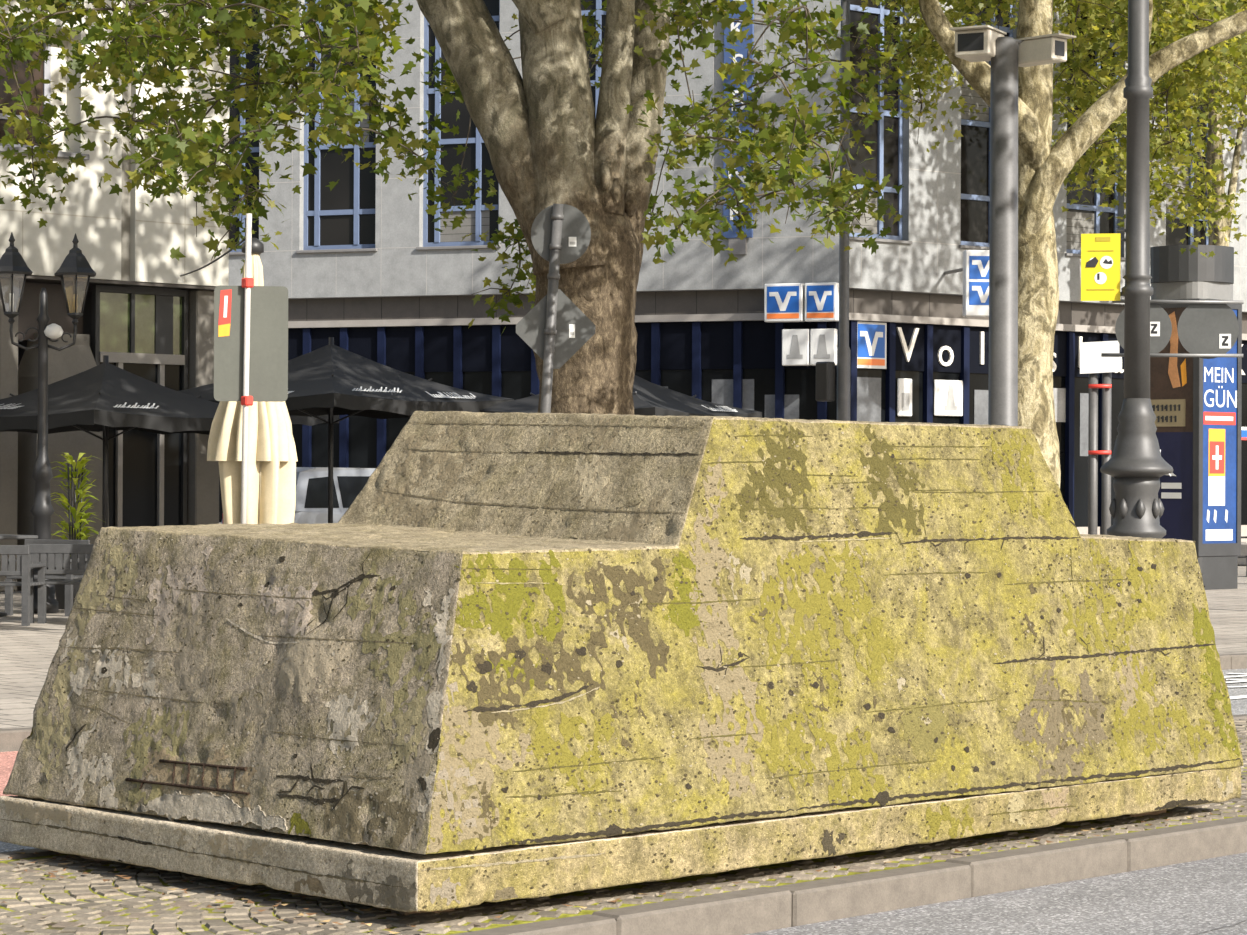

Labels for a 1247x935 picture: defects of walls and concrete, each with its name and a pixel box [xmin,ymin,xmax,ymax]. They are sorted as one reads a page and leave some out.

leakage [603,489,669,541]
leakage [731,426,813,540]
leakage [857,424,926,548]
crack [304,552,381,638]
leakage [567,557,673,679]
crack [463,684,593,712]
leakage [1013,641,1144,787]
crack [276,762,398,810]